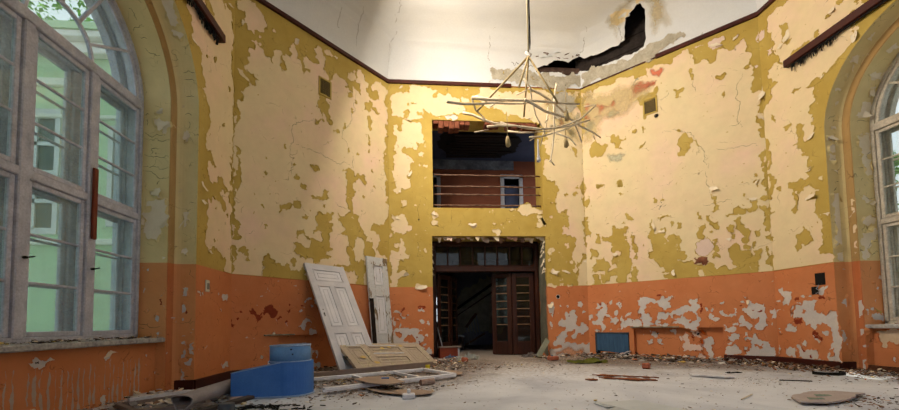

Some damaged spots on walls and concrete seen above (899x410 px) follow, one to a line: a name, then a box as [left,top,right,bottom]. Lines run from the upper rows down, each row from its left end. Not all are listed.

leakage [546,68,663,139]
peeling [141,108,173,243]
peeling [161,0,899,369]
peeling [27,356,54,371]